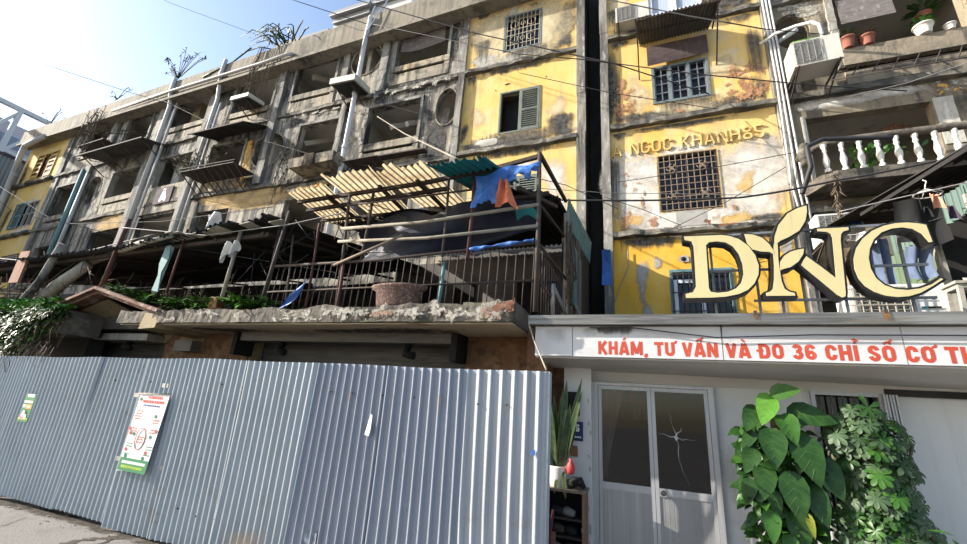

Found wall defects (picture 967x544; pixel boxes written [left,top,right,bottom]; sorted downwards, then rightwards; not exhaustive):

peeling [613,78,713,124]
peeling [710,57,771,103]
water stain [461,113,572,157]
peeling [273,298,515,323]